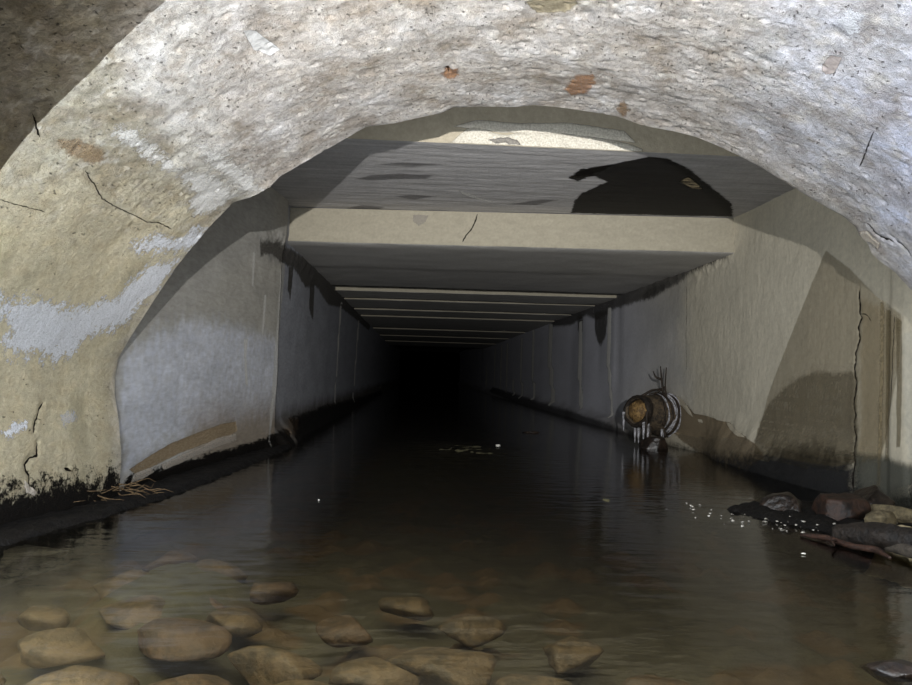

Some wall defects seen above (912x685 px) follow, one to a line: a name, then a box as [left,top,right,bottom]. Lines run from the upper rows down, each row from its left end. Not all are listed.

crack [85,170,171,229]
damp [0,123,265,370]
crack [859,224,911,256]
crack [24,403,43,496]
damp [0,240,383,525]
crack [852,290,871,489]